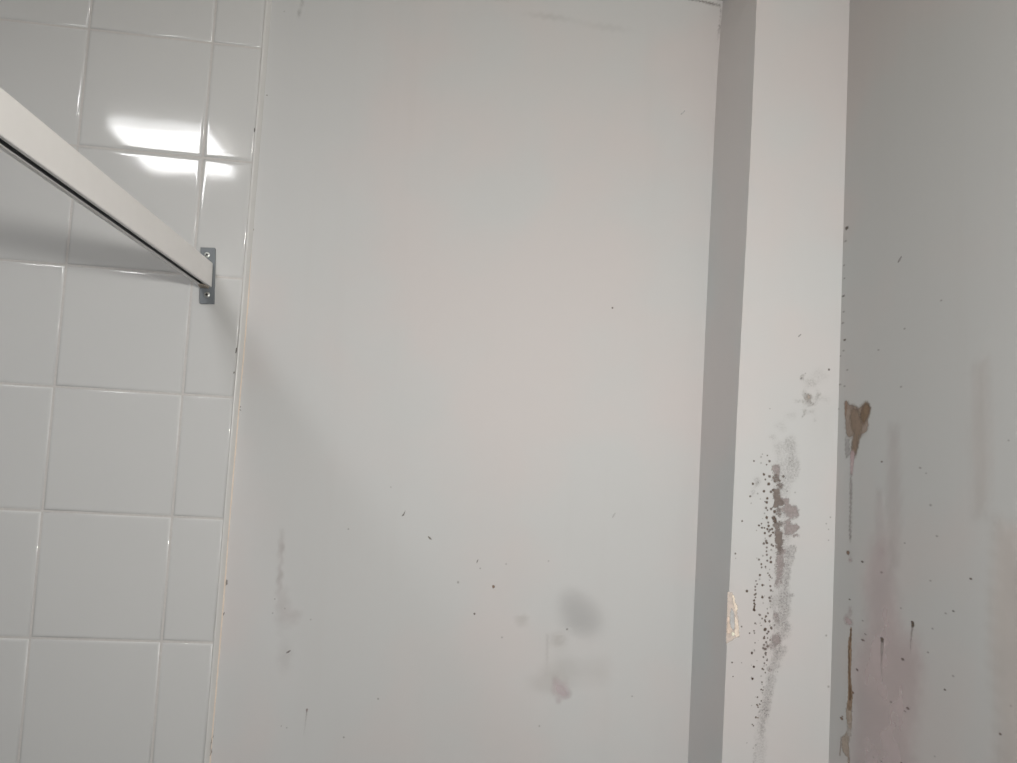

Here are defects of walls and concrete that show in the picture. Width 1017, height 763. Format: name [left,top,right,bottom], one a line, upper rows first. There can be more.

peeling [726,592,739,643]
water stain [741,455,800,726]